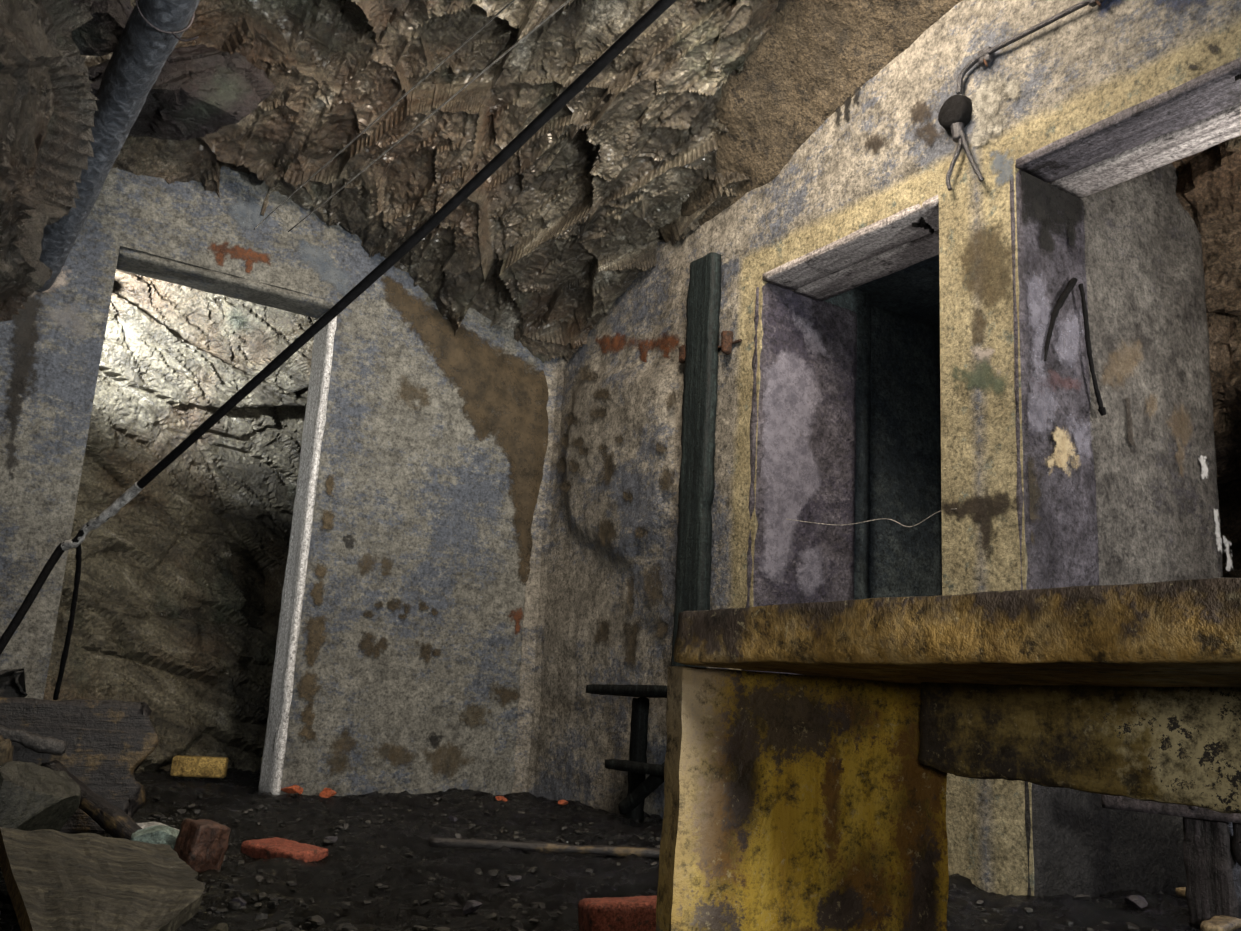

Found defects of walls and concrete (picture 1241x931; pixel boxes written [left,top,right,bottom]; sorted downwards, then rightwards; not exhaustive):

rust [208,242,270,273]
peeling [397,381,430,409]
water stain [942,491,1019,557]
peeling [359,554,392,576]
water stain [379,732,467,776]